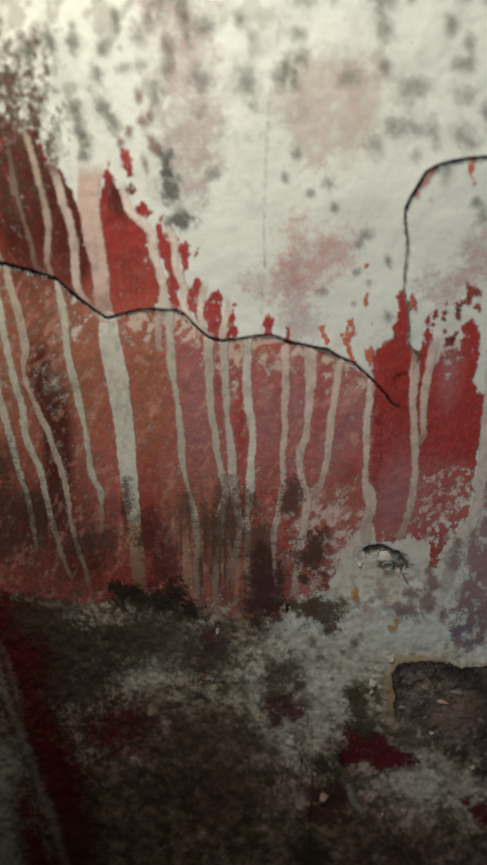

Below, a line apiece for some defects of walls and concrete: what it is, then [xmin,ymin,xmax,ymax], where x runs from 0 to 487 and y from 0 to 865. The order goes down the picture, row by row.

damp [0,27,350,721]
peeling [120,148,238,340]
crack [0,157,487,406]
peeling [262,313,274,335]
peeling [340,318,374,366]
damp [360,378,377,533]
flaking render [358,545,414,584]
damp [401,345,438,528]
damp [391,374,487,653]
damp [300,751,364,830]
damp [343,682,377,740]
spalling [369,655,487,782]